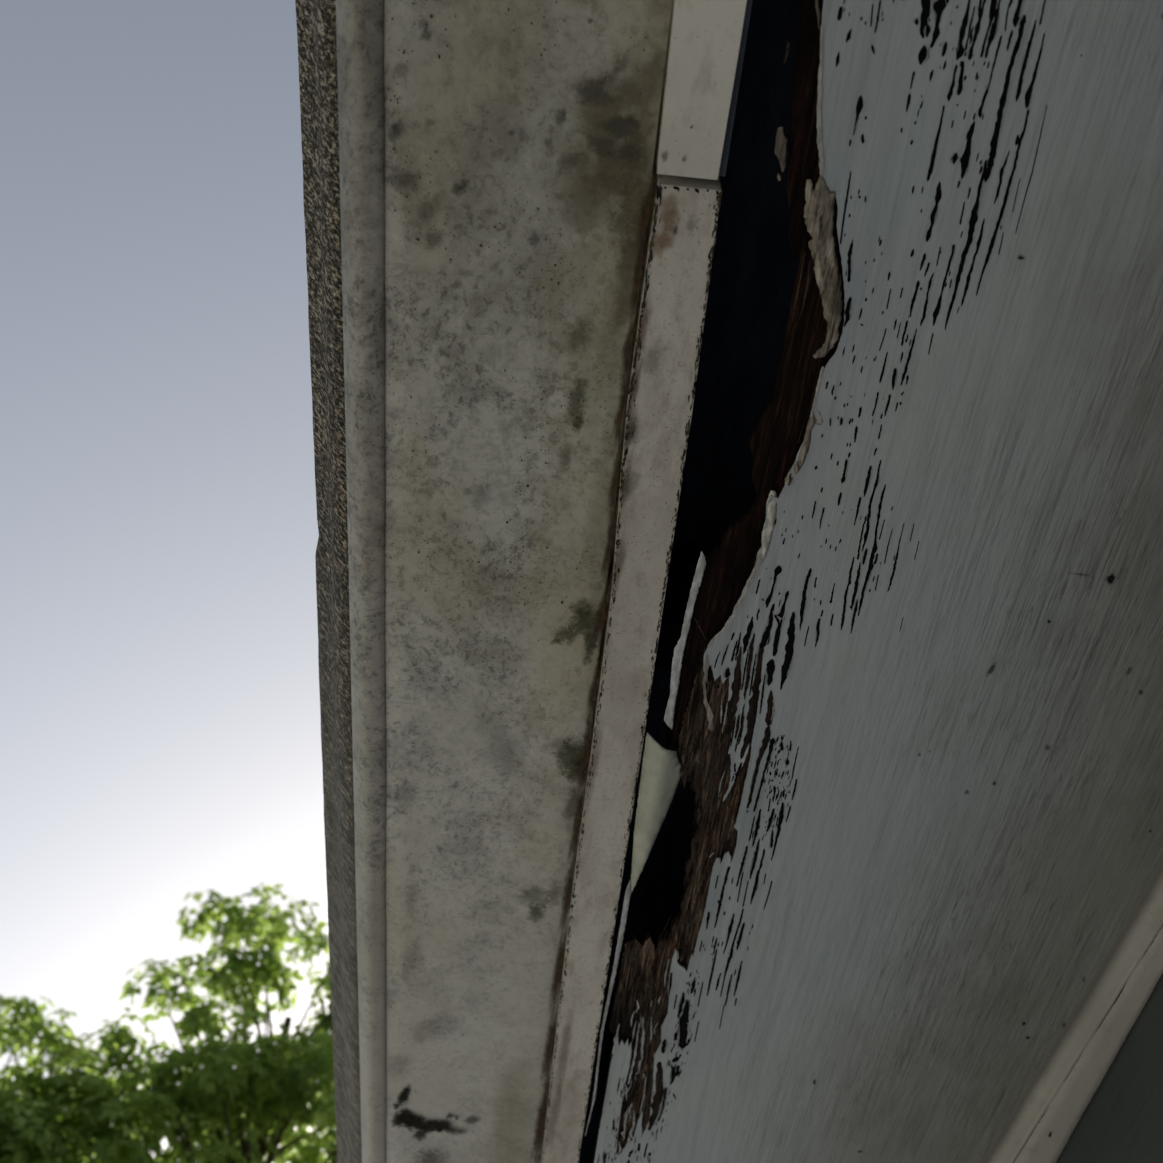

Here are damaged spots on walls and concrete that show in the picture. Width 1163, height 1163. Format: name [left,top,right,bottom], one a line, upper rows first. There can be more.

water stain [585,97,677,252]
spalling [542,182,723,1163]
peeling [597,0,1047,1163]